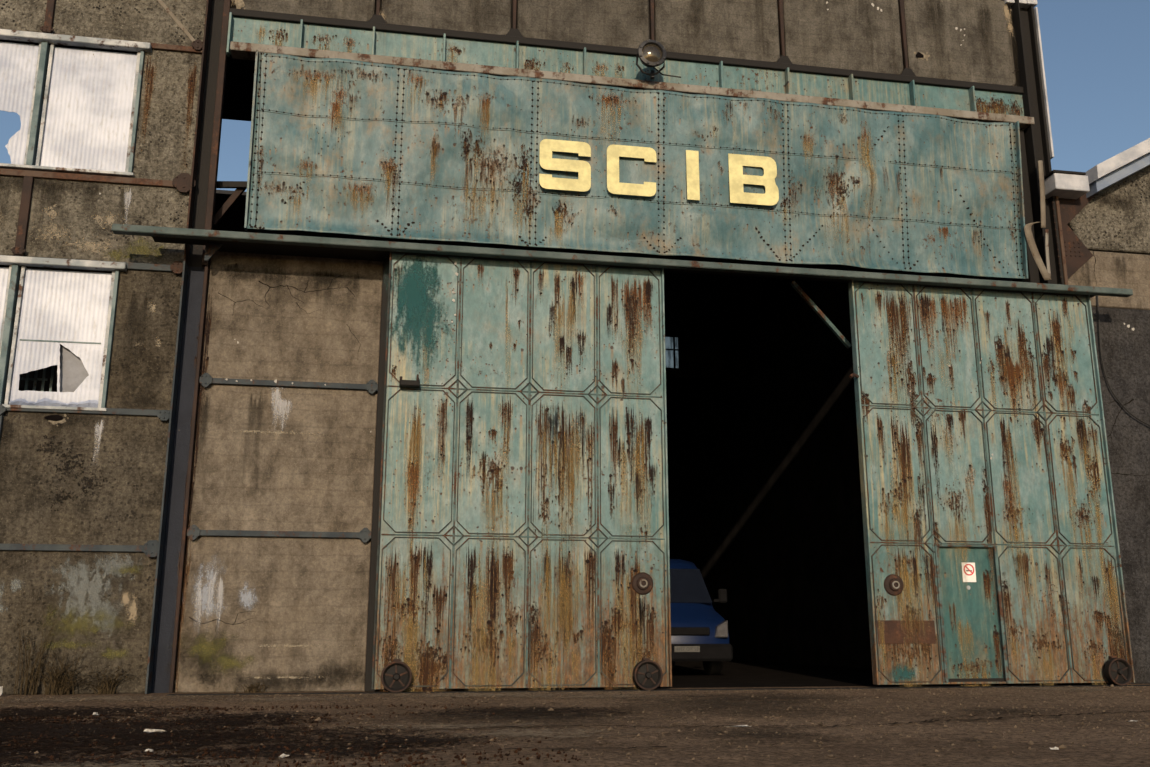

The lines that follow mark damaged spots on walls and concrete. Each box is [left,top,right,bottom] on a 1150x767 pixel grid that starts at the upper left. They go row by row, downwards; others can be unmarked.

corrosion [253,145,317,211]
corrosion [289,64,387,132]
corrosion [409,70,543,227]
corrosion [550,200,579,237]
corrosion [780,127,902,223]
corrosion [968,96,1023,116]
corrosion [506,267,522,350]
corrosion [536,269,586,376]
corrosion [607,274,653,394]
corrosion [861,291,1129,687]
peeling [53,554,137,631]
corrosion [379,397,658,692]